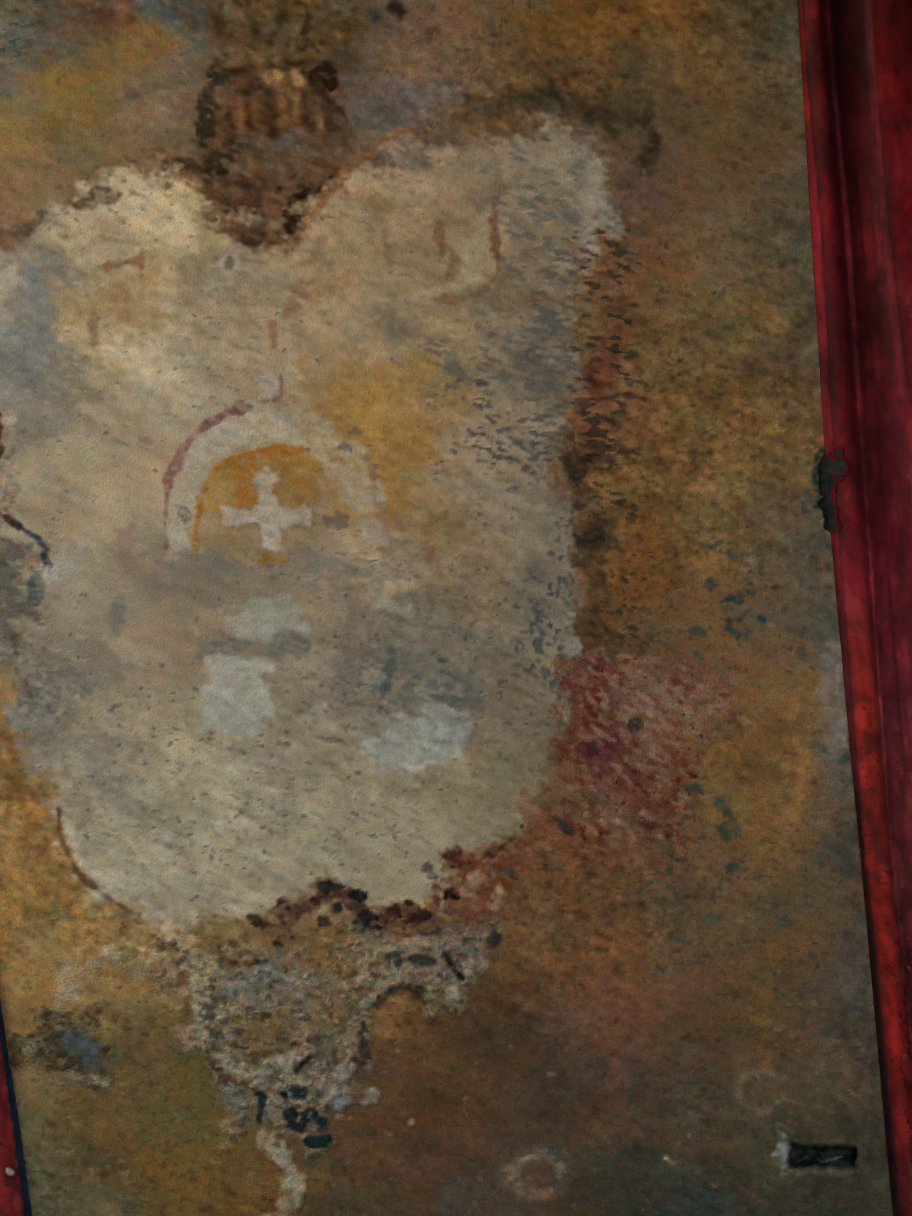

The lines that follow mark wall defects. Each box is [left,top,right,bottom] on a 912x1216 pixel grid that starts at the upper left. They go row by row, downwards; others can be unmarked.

crack [0,409,71,701]
peeling [0,77,757,1216]